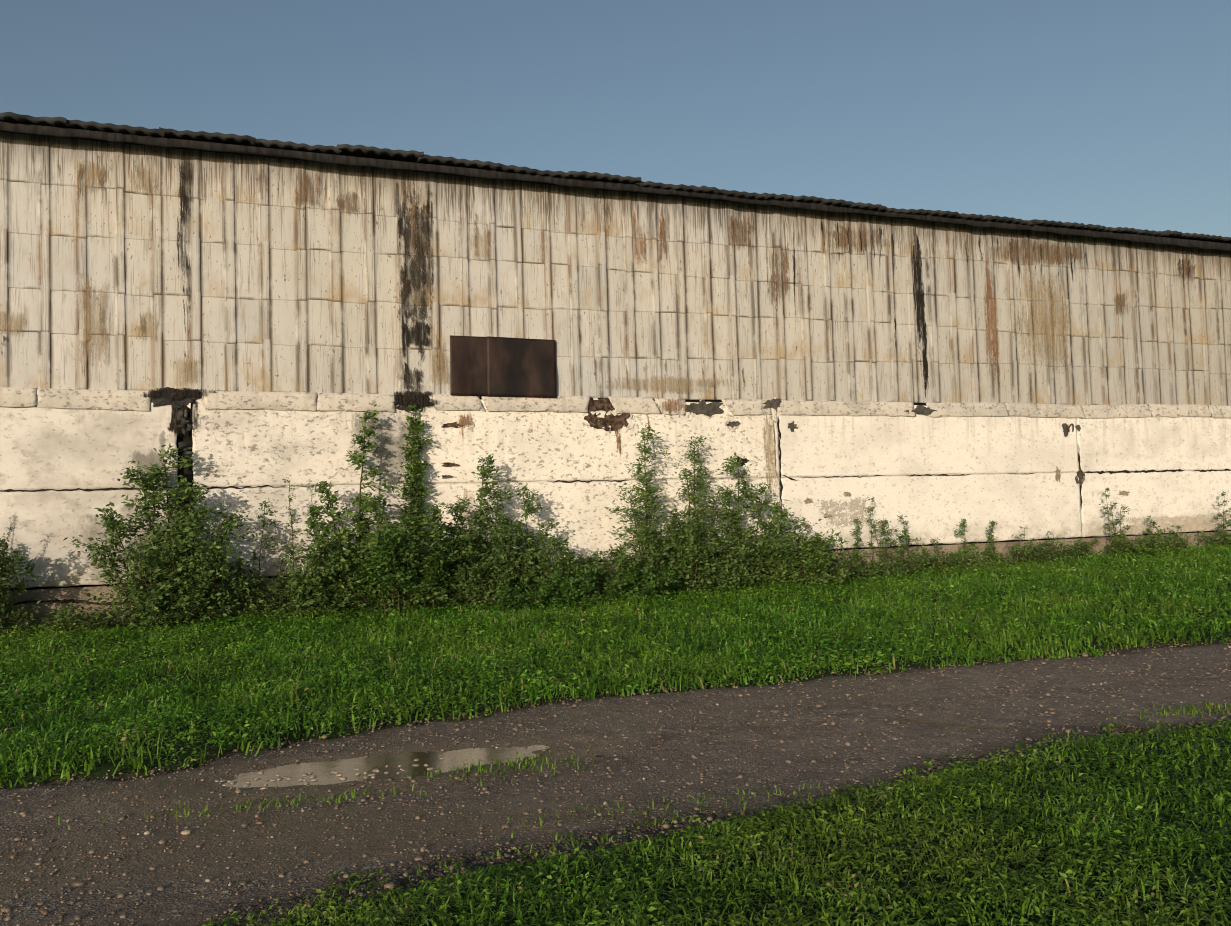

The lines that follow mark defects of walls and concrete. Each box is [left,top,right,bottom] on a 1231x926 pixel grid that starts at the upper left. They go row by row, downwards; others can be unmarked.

leakage [177,156,192,357]
leakage [396,183,433,385]
leakage [821,221,895,275]
leakage [911,225,928,375]
corrosion [985,257,1000,387]
corrosion [1015,239,1073,374]
peeling [589,397,635,433]
spalling [685,399,740,428]